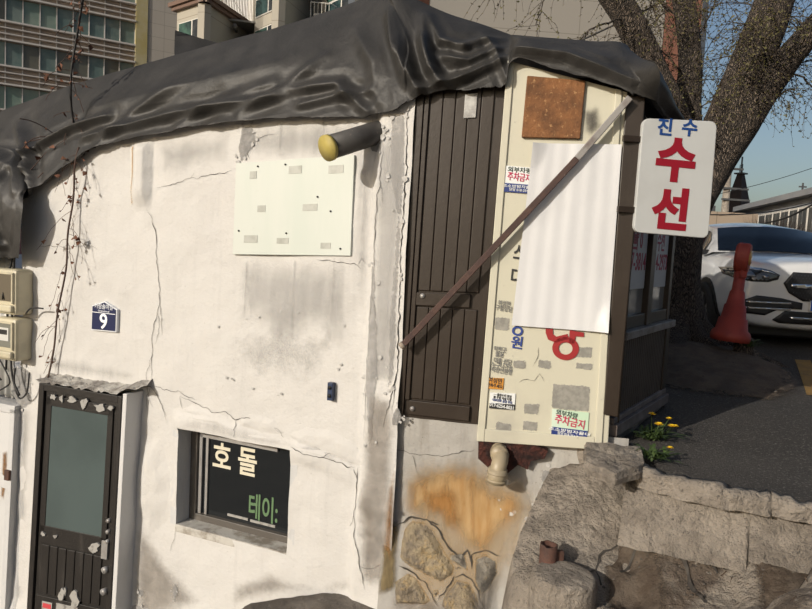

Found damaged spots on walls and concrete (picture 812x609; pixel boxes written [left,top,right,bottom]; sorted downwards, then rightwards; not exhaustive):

spalling [235,120,258,163]
crack [143,223,248,434]
crack [317,142,383,306]
crack [385,112,408,416]
corrosion [413,473,522,591]